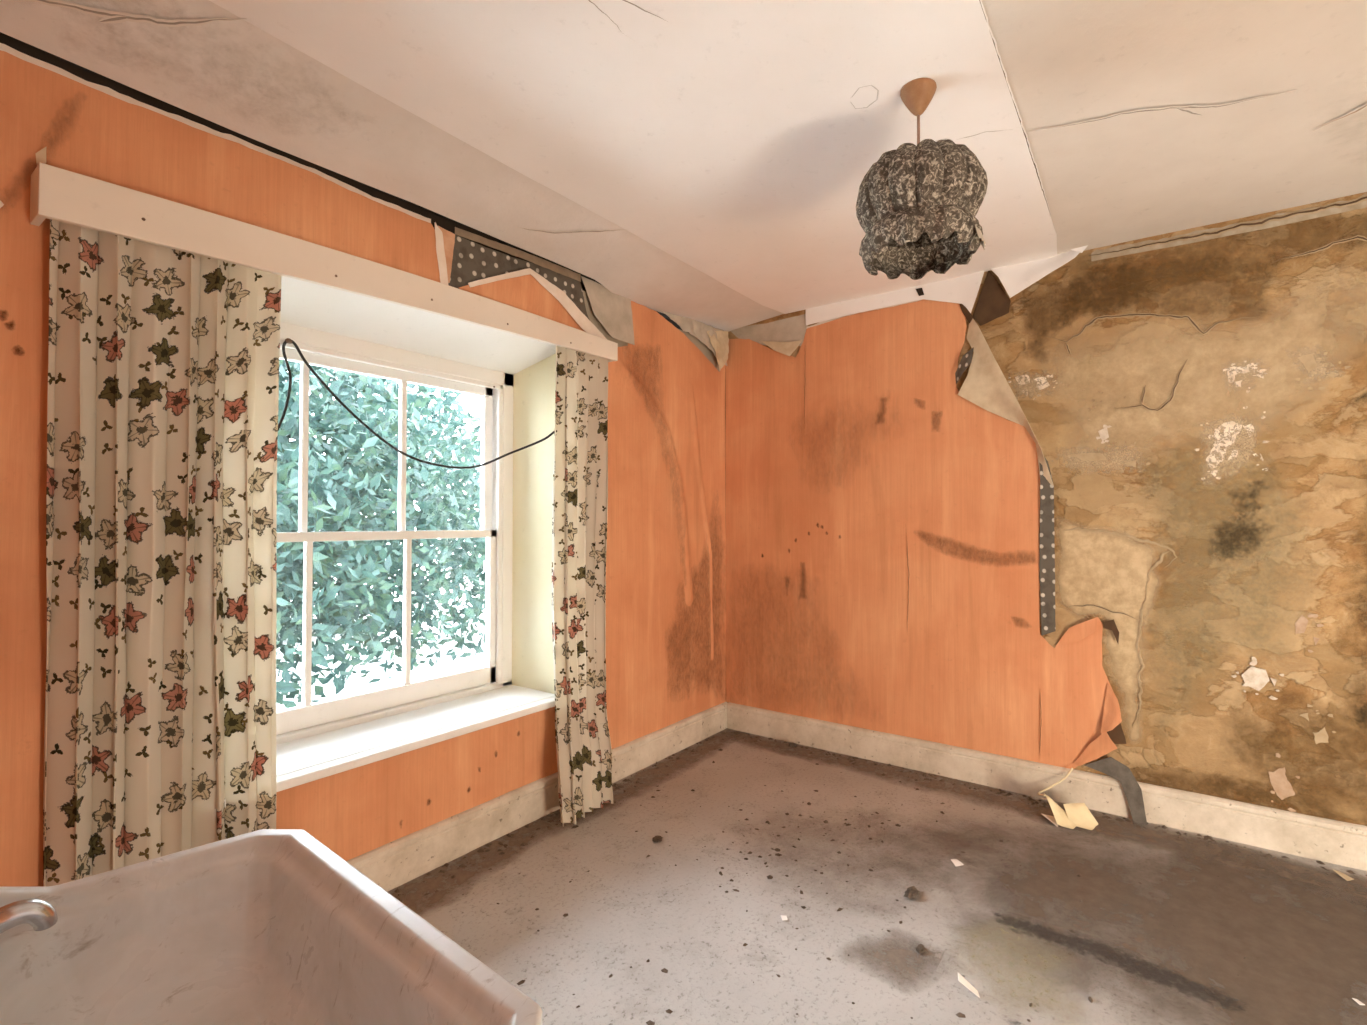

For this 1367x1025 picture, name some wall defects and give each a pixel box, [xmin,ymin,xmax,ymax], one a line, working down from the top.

crack [587,0,673,42]
crack [934,0,1295,232]
crack [1089,192,1367,263]
spalling [1008,372,1062,399]
water stain [1059,300,1334,448]
spalling [1195,359,1270,484]
water stain [1059,523,1157,739]
spalling [1232,657,1284,700]
spalling [1300,704,1336,744]
water stain [1273,685,1367,797]
water stain [1140,774,1286,810]
spalling [1268,753,1300,812]